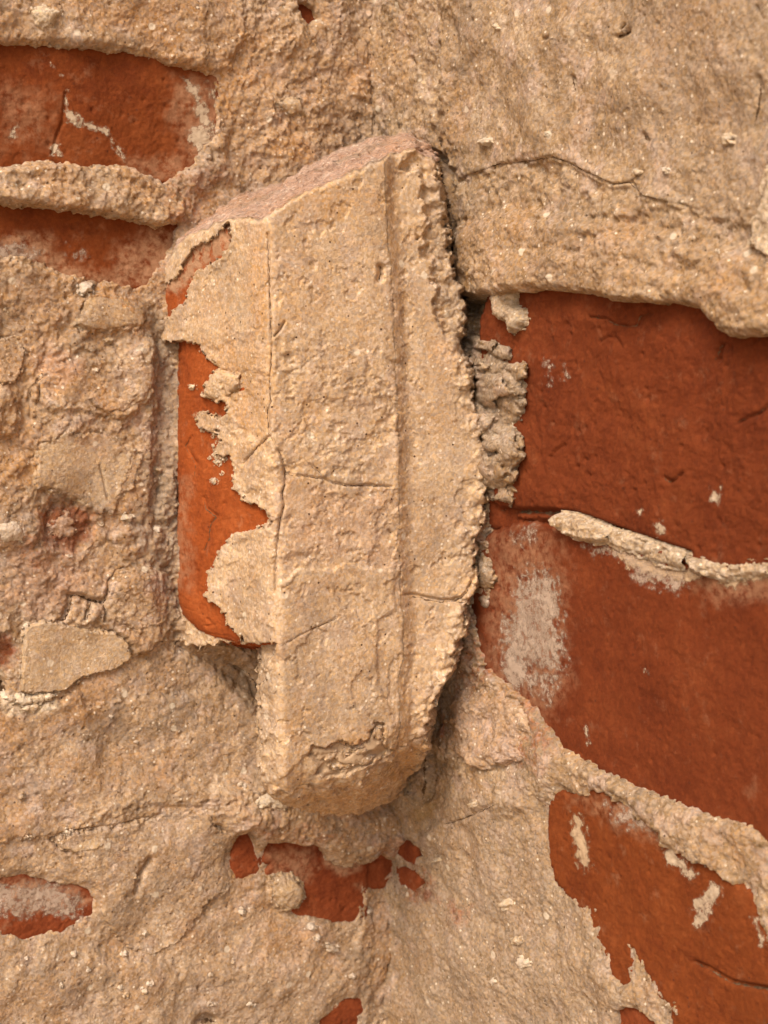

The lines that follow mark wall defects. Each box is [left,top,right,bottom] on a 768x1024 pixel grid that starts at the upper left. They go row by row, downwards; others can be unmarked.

crack [441,156,674,222]
spalling [188,368,242,401]
spalling [196,412,228,486]
efflorescence [500,563,571,706]